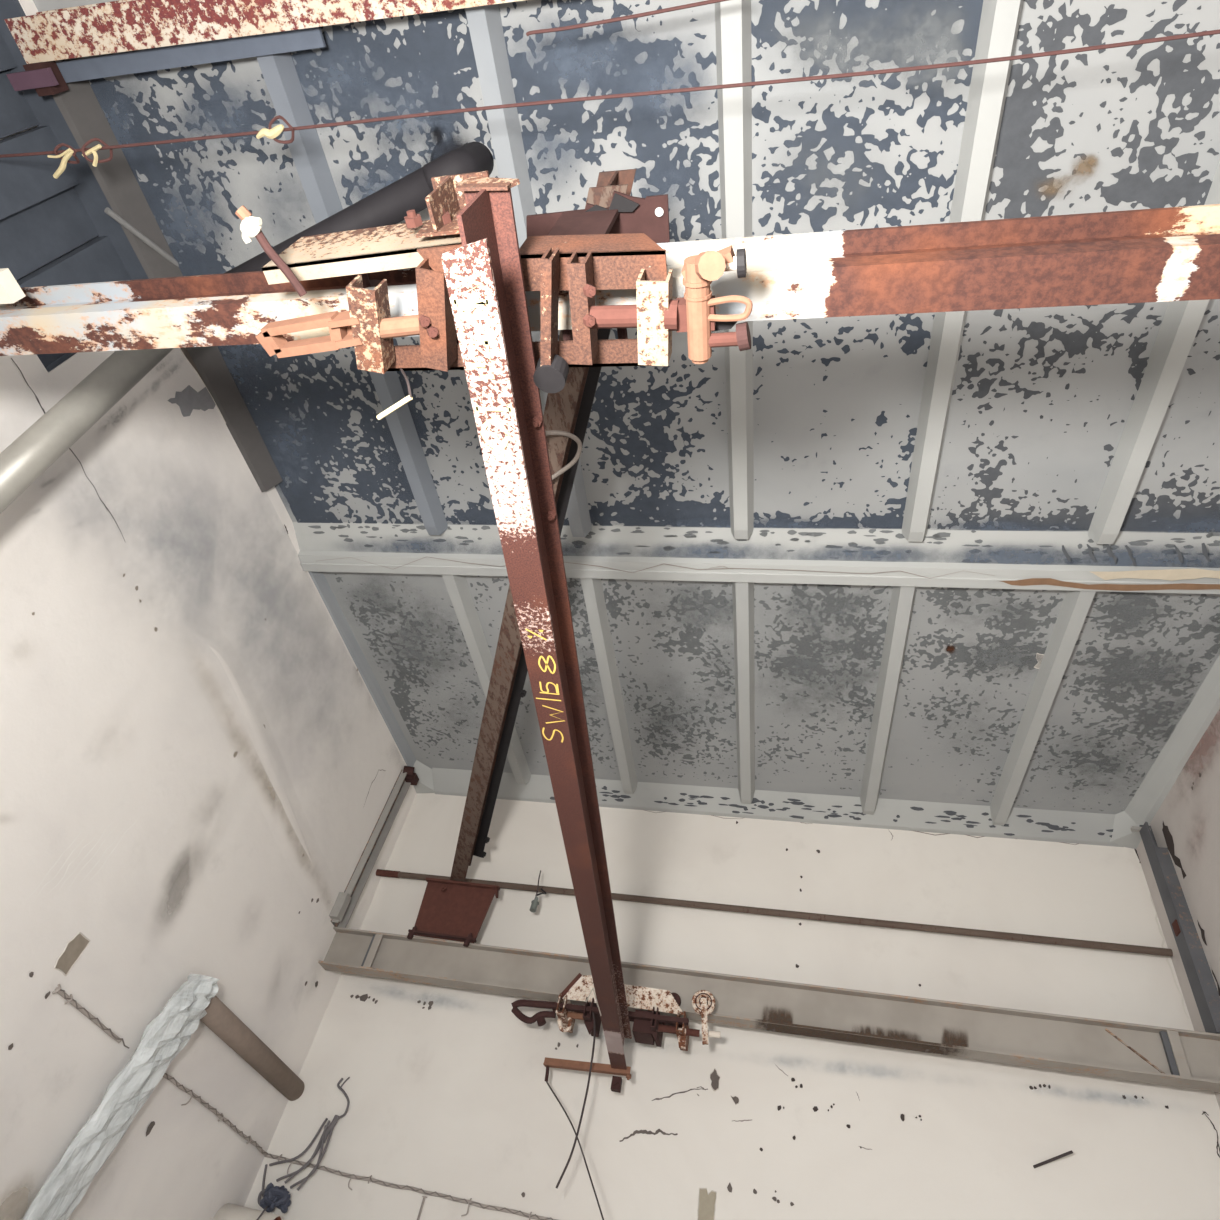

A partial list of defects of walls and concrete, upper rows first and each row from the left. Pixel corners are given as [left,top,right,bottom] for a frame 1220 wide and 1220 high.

peeling [88,60,293,276]
peeling [291,8,496,206]
peeling [499,0,721,242]
peeling [751,0,983,236]
peeling [986,0,1220,219]
spalling [168,347,226,423]
peeling [237,346,497,547]
peeling [335,574,486,762]
peeling [470,576,508,648]
peeling [561,303,1220,836]
water stain [167,862,189,912]
crack [619,1086,708,1142]